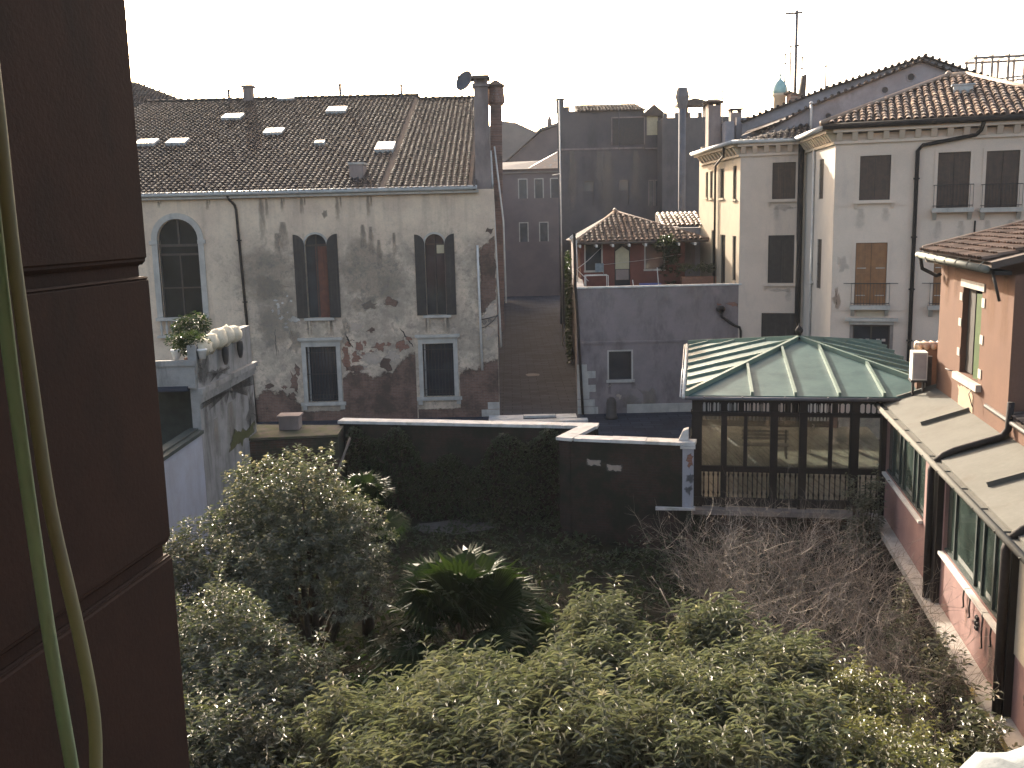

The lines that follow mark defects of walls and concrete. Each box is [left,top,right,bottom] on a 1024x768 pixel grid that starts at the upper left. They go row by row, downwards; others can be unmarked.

spalling [362,297,398,309]
spalling [479,228,497,316]
spalling [256,327,499,422]